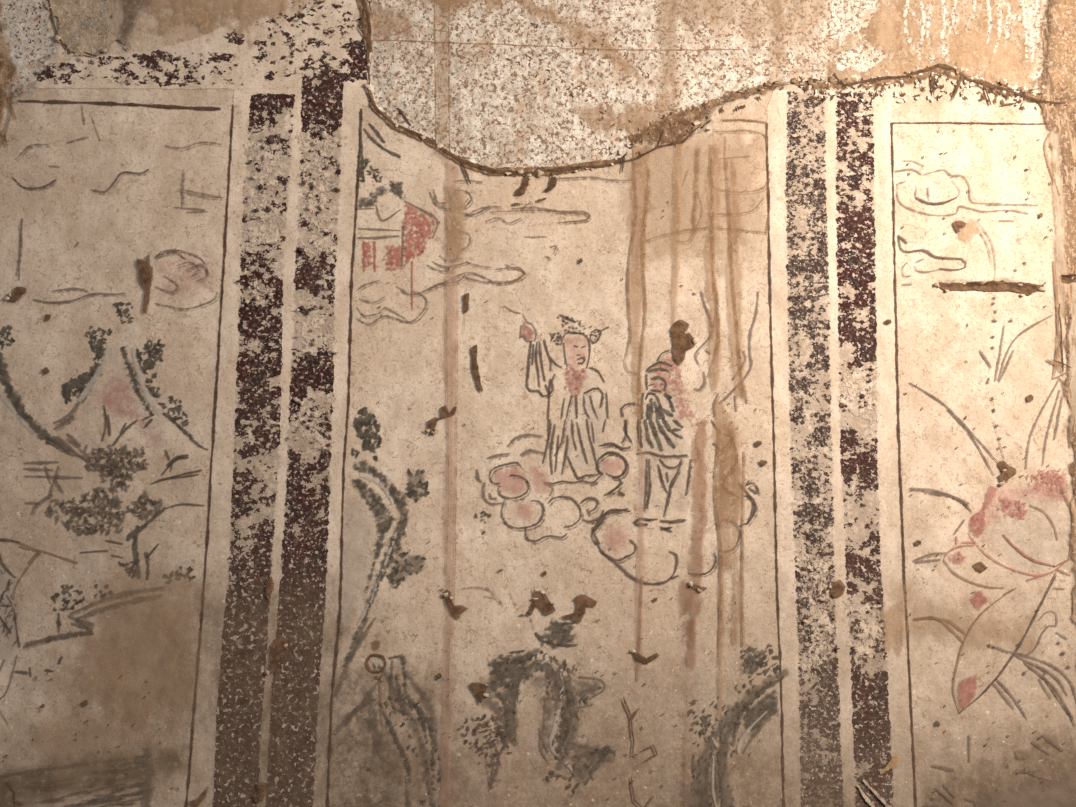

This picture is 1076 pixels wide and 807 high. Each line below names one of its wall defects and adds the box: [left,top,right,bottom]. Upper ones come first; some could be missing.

flaking render [0,0,143,102]
peeling [357,0,1067,206]
leakage [625,147,650,451]
leakage [692,149,720,378]
leakage [726,158,743,398]
spalling [1061,274,1076,283]
leakage [714,430,746,657]